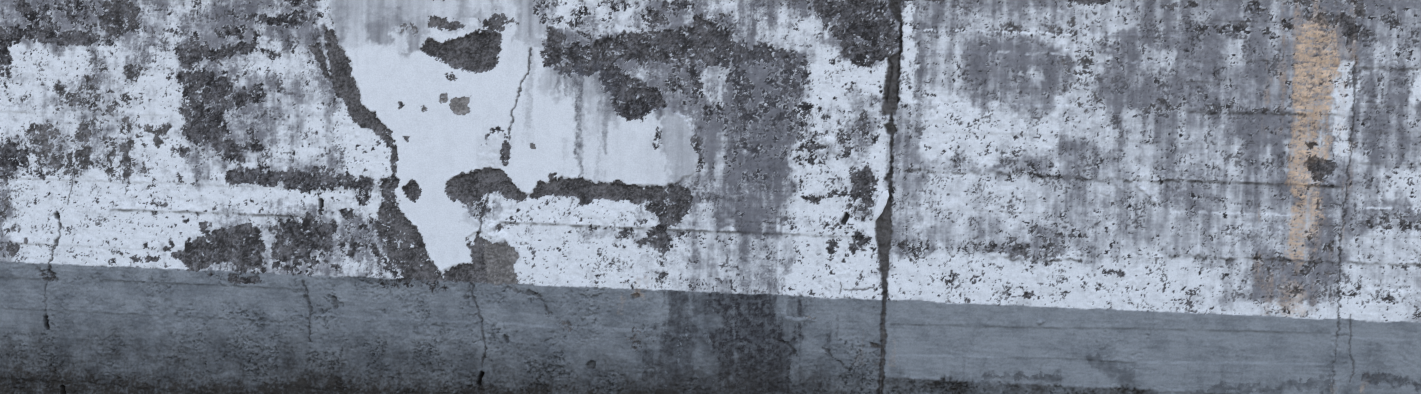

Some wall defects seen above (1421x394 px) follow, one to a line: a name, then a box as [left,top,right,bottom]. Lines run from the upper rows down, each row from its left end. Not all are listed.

crack [35,167,75,316]
spalling [0,0,880,292]
crack [772,0,904,394]
leakage [641,0,1141,394]
leakage [1078,0,1280,219]
rust [1252,0,1360,318]
leakage [1363,47,1408,187]
leakage [1184,360,1333,394]
leakage [1360,342,1421,394]